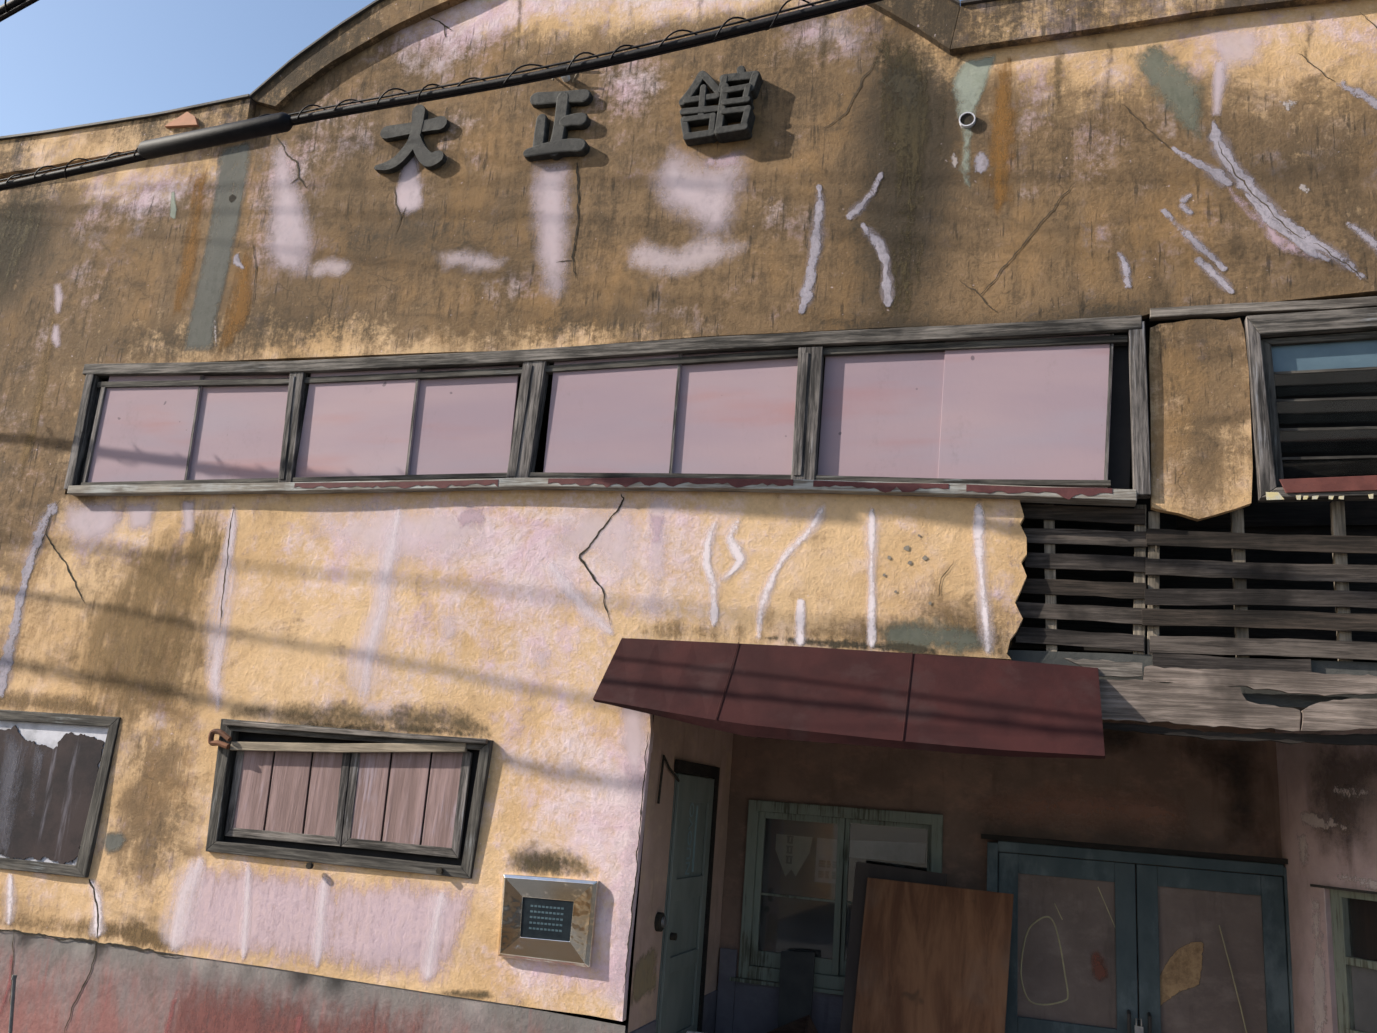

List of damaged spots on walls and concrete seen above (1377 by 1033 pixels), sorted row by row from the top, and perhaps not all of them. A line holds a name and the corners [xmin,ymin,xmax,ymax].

peeling [534,168,567,289]
peeling [634,155,737,269]
crack [960,188,1070,312]
peeling [1254,217,1298,252]
crack [0,503,85,697]
damp [0,515,219,716]
crack [549,494,624,633]
crack [0,859,202,1032]